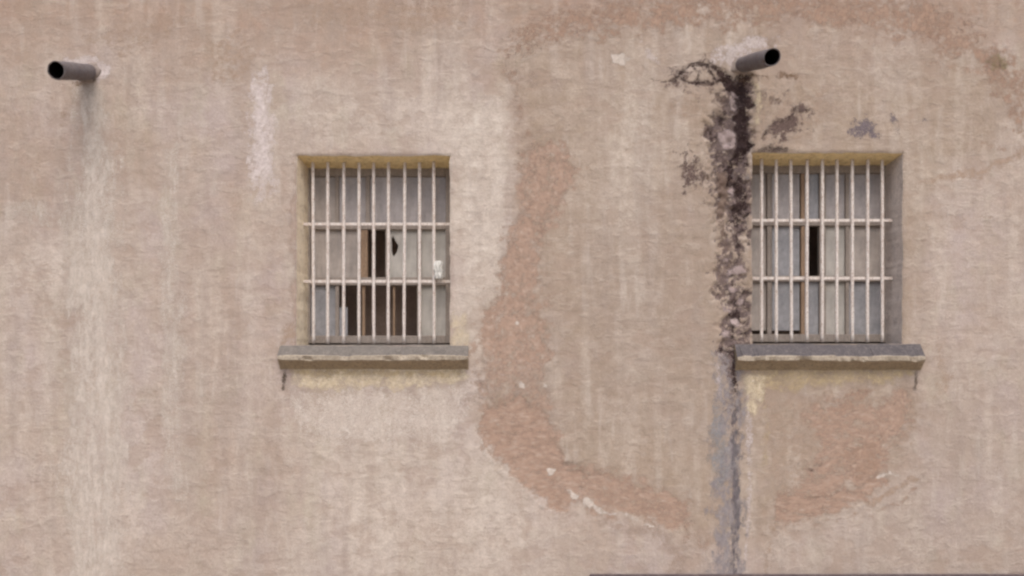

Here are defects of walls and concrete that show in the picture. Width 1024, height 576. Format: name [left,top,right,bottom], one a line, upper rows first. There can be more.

water stain [672,142,713,195]
water stain [497,0,1024,187]